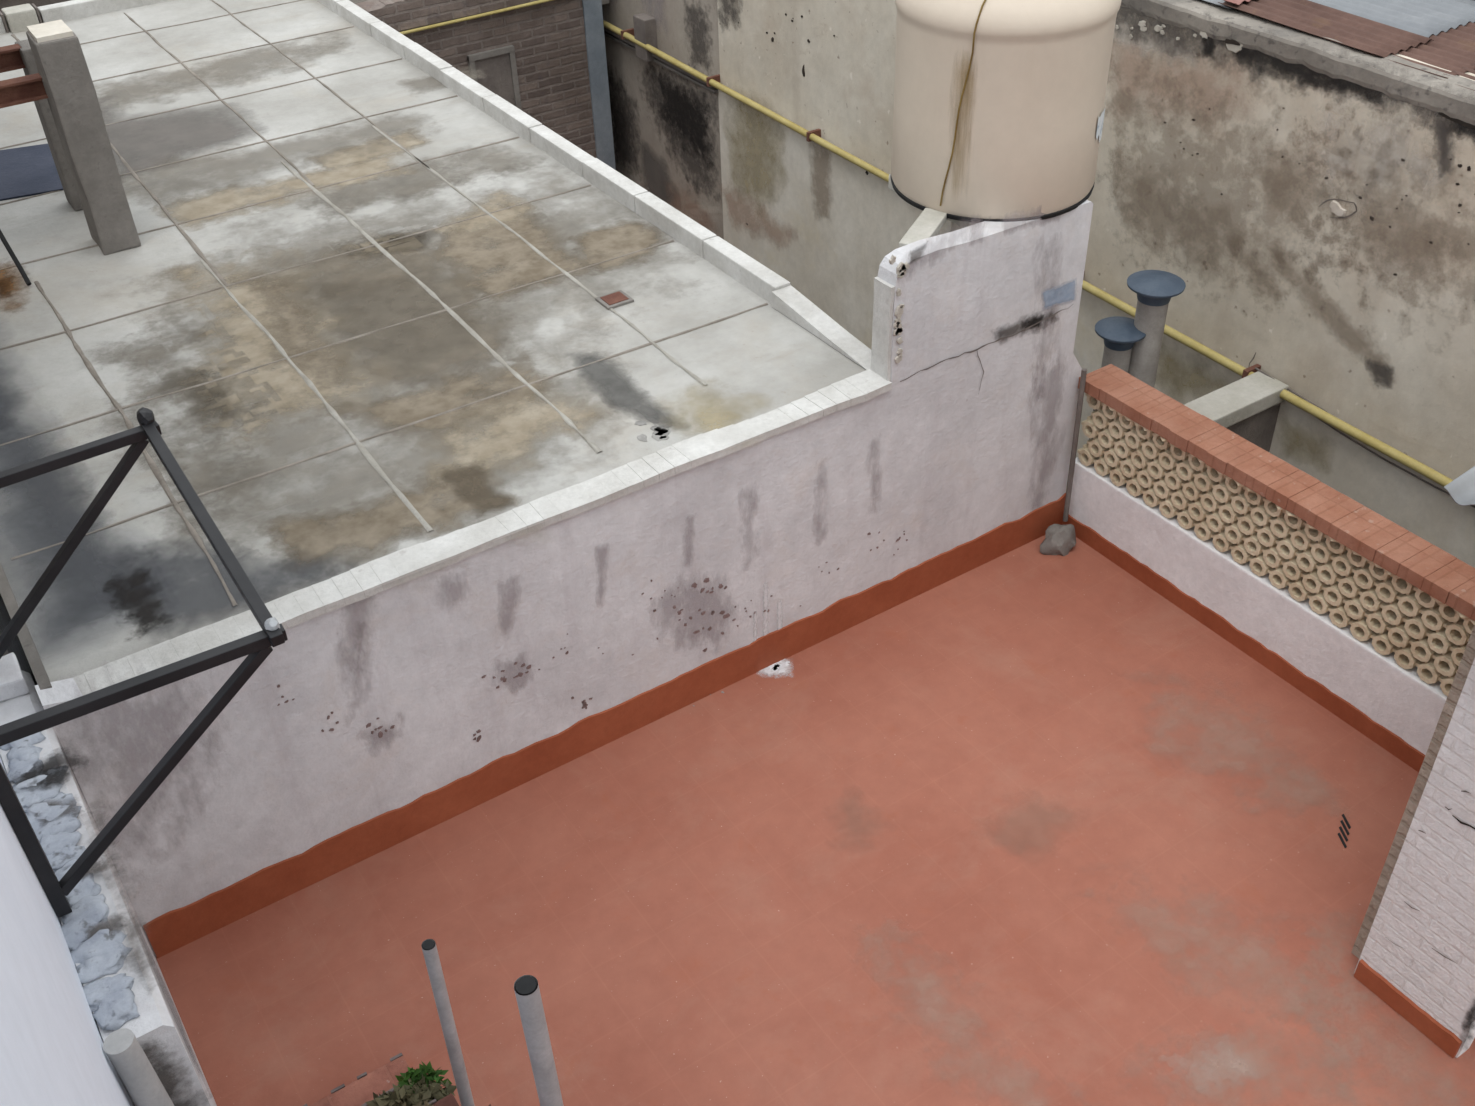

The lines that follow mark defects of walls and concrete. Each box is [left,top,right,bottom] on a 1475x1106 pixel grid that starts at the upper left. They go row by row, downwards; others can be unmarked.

water stain [686,0,740,68]
water stain [99,49,515,226]
water stain [1116,6,1475,173]
spalling [889,255,909,363]
crack [900,304,1073,395]
water stain [1303,286,1392,387]
water stain [0,192,661,650]
water stain [16,745,87,822]
water stain [87,914,201,1072]
water stain [143,1046,191,1106]